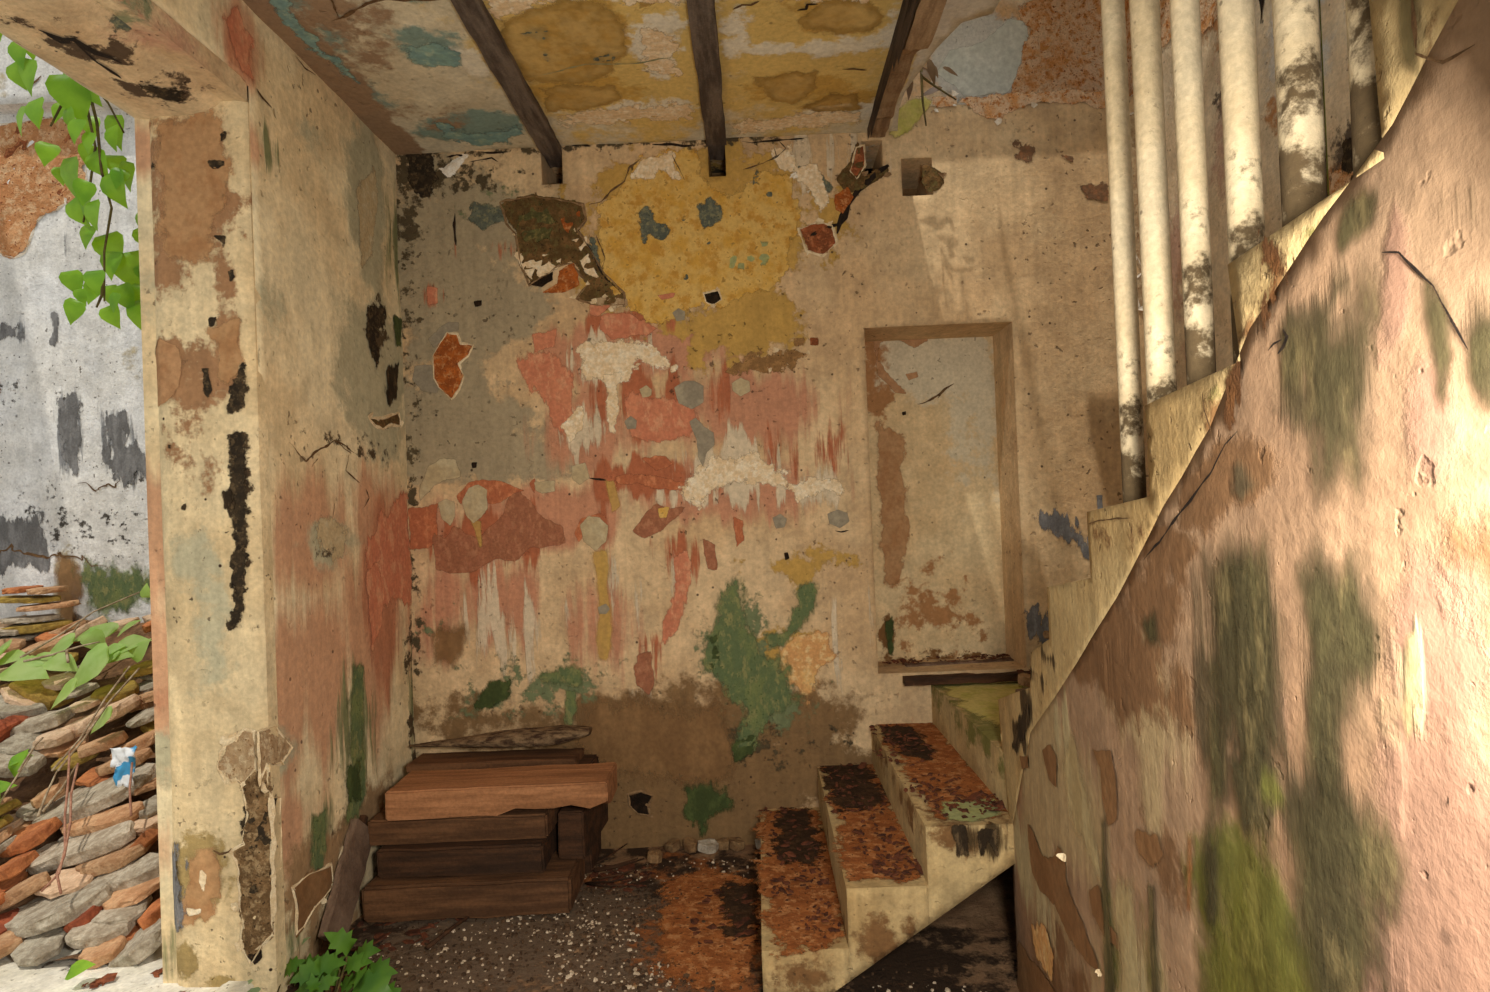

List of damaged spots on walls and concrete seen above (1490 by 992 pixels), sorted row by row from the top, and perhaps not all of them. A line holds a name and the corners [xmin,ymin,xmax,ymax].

flaking render [0,117,88,259]
damp [140,85,233,264]
spalling [366,304,474,430]
peeling [499,142,892,340]
crack [1382,251,1468,350]
damp [226,546,248,631]
peeling [365,462,605,651]
crack [1144,393,1237,559]
spalling [216,726,344,966]
damp [538,579,817,837]
damp [1202,545,1285,934]
damp [1295,550,1402,992]